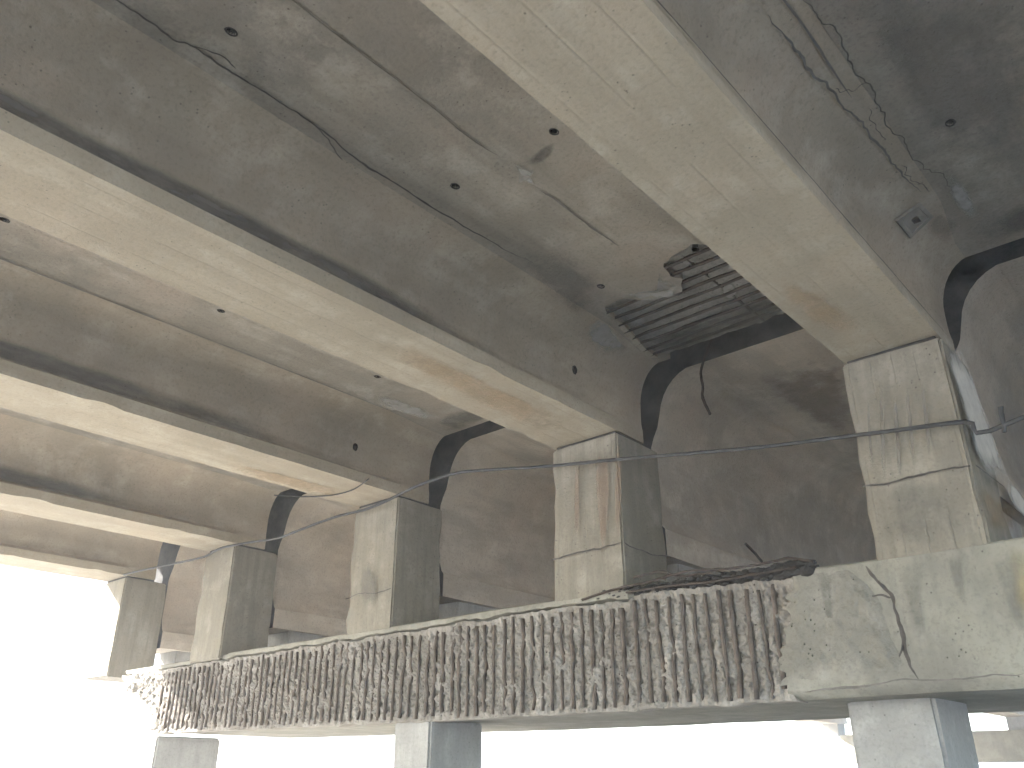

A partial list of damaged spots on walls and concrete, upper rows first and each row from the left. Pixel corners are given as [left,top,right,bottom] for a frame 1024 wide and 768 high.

crack [116,0,533,263]
crack [541,191,617,245]
crack [657,0,953,336]
spalling [606,244,785,415]
spalling [122,543,819,735]
crack [552,542,671,560]
crack [808,566,1024,692]
crack [862,465,1005,488]